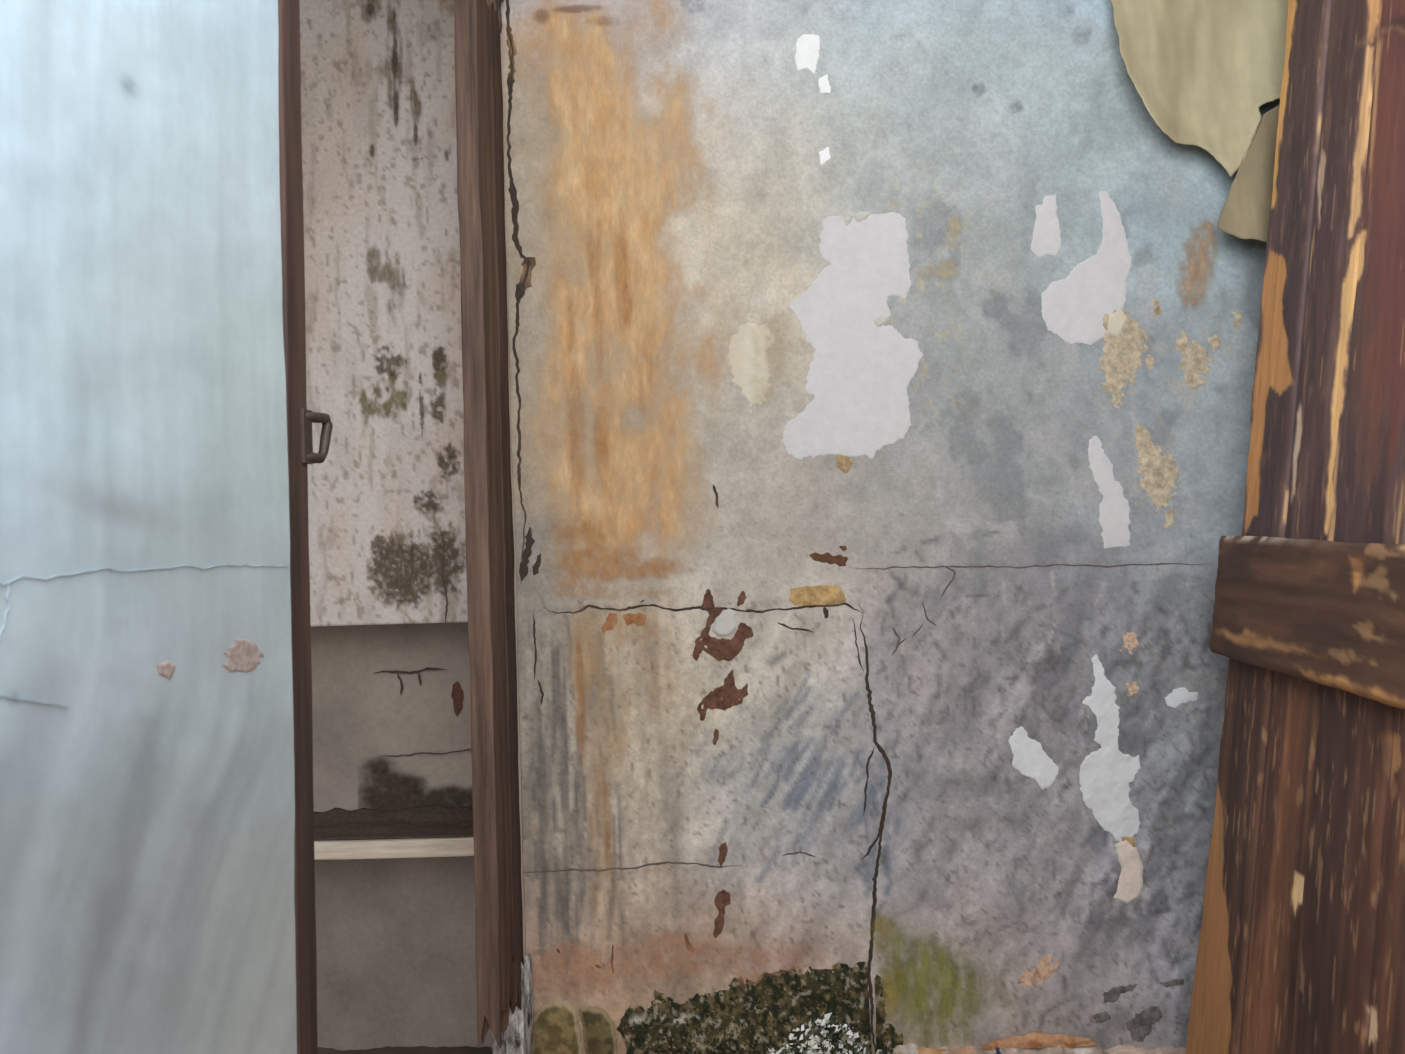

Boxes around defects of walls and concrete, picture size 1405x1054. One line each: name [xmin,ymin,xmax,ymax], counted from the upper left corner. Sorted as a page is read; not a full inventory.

water stain [363,0,420,143]
water stain [360,346,445,426]
crack [505,0,541,581]
peeling [782,211,923,473]
peeling [1041,191,1162,416]
water stain [367,491,465,610]
water stain [437,444,457,478]
crack [712,484,720,508]
peeling [1088,424,1183,549]
crack [525,563,1201,1054]
peeling [1009,726,1059,789]
peeling [1079,655,1144,904]